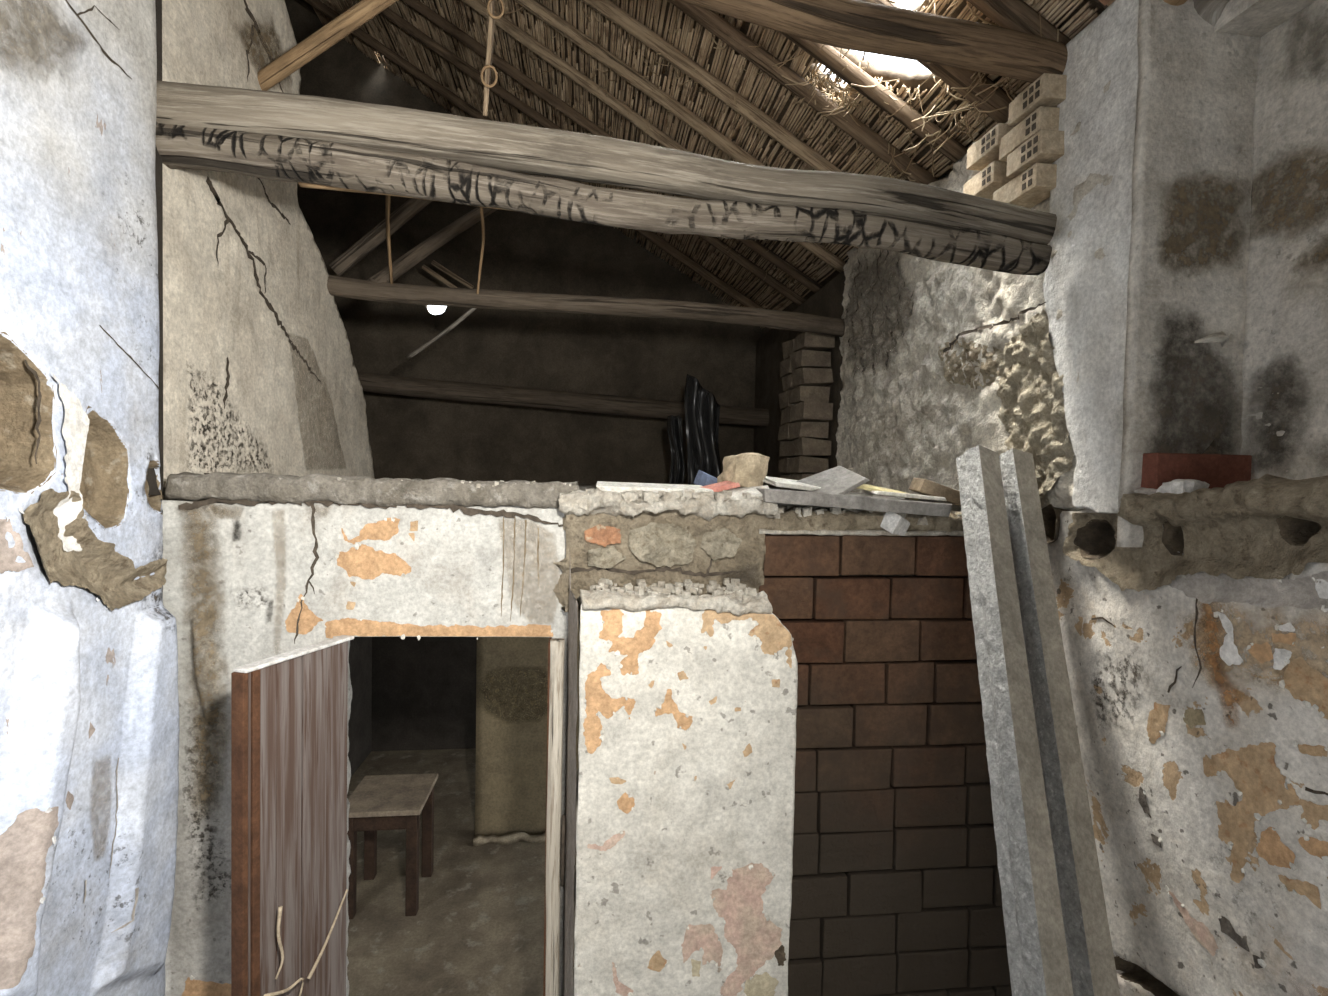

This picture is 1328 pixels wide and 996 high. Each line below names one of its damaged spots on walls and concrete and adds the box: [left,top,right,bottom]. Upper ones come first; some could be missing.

leakage [0,0,80,66]
crack [65,0,132,79]
crack [206,176,321,383]
leakage [1160,149,1328,271]
leakage [1152,315,1236,454]
flaking render [0,332,168,611]
leakage [144,505,240,901]
crack [178,473,563,644]
peeling [284,518,553,640]
peeling [583,609,693,754]
flaking render [1062,513,1328,720]
crack [1305,787,1328,796]